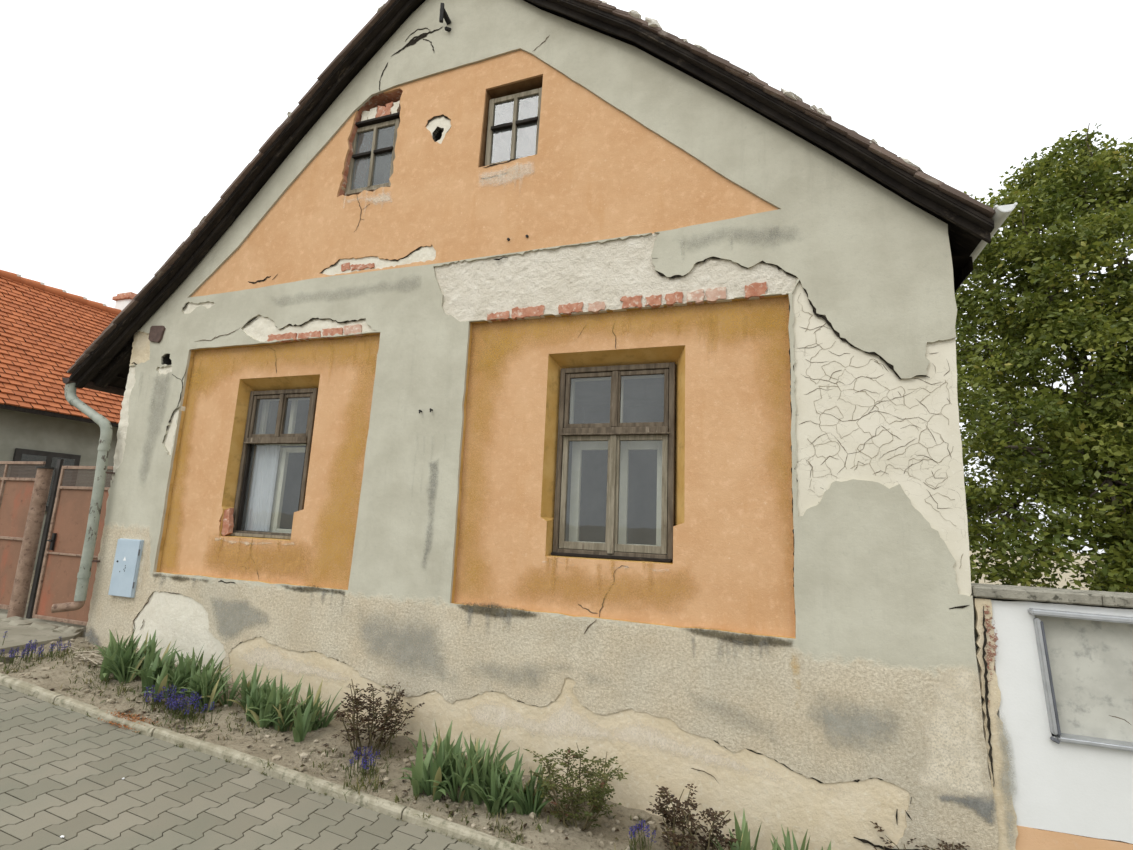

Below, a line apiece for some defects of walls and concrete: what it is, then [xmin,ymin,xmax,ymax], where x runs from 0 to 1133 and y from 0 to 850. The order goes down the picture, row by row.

crack [379,26,443,91]
spalling [355,100,401,128]
peeling [243,315,374,343]
peeling [164,396,186,455]
peeling [321,233,972,596]
crack [657,257,956,587]
peeling [133,591,910,850]